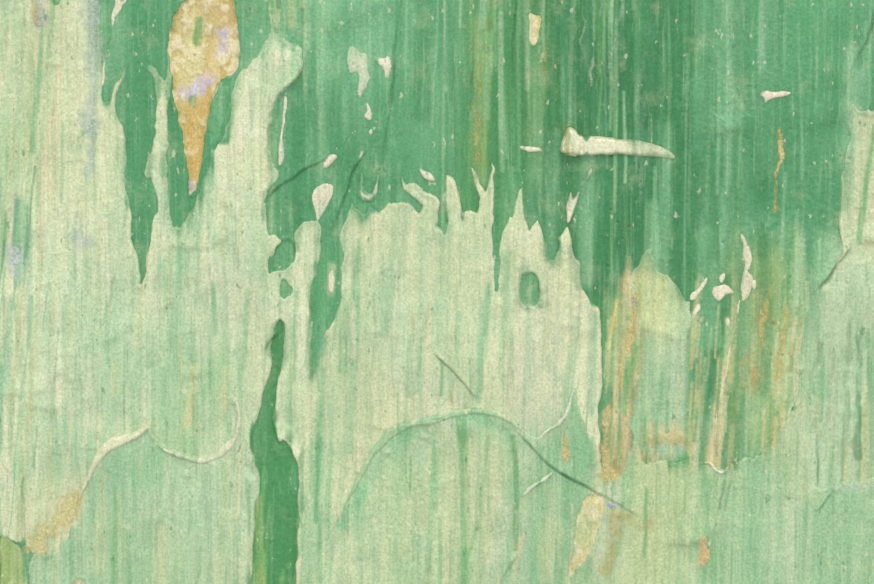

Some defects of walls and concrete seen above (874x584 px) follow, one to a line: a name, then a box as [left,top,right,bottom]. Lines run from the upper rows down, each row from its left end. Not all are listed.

peeling [560,144,579,157]
peeling [760,90,791,102]
peeling [838,108,874,250]
crack [840,0,874,95]
peeling [0,0,333,584]
peeling [292,160,874,584]